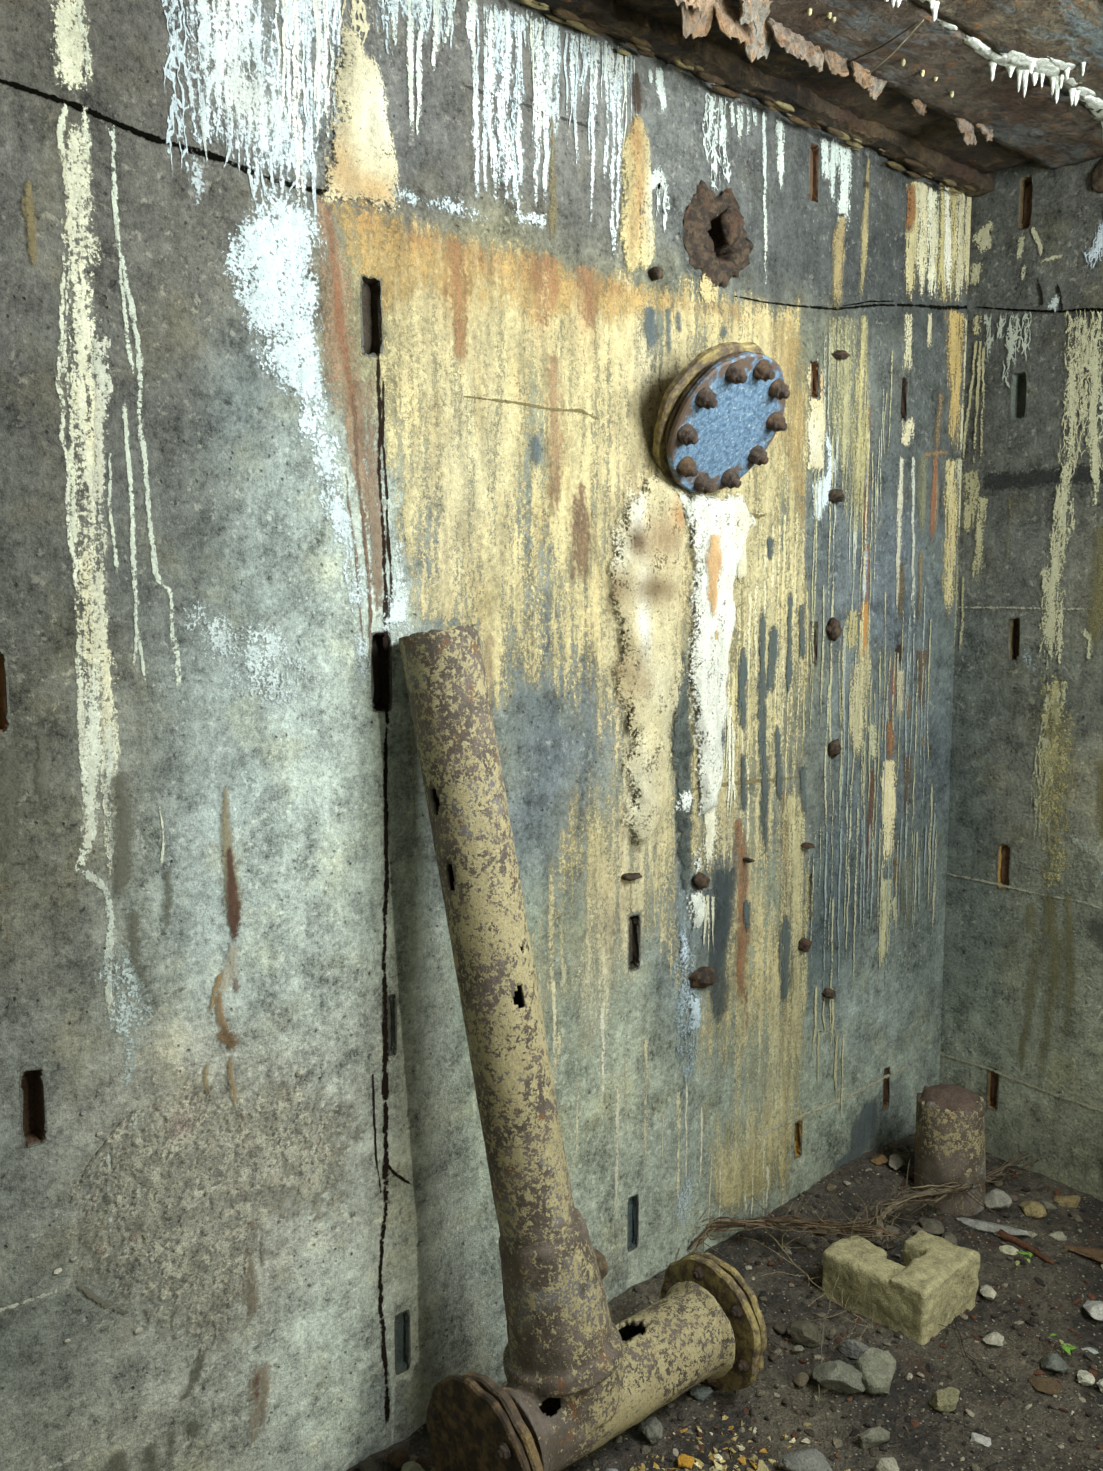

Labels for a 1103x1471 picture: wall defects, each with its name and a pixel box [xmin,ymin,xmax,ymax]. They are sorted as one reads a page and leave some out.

crack [0,79,328,196]
corrosion [620,73,754,288]
corrosion [674,0,887,100]
corrosion [832,160,870,304]
crack [735,279,1103,313]
corrosion [912,99,927,116]
corrosion [955,118,994,146]
damp [51,0,311,1086]
corrosion [310,198,386,662]
damp [162,0,1103,1238]
corrosion [898,394,948,620]
crack [372,354,410,1435]